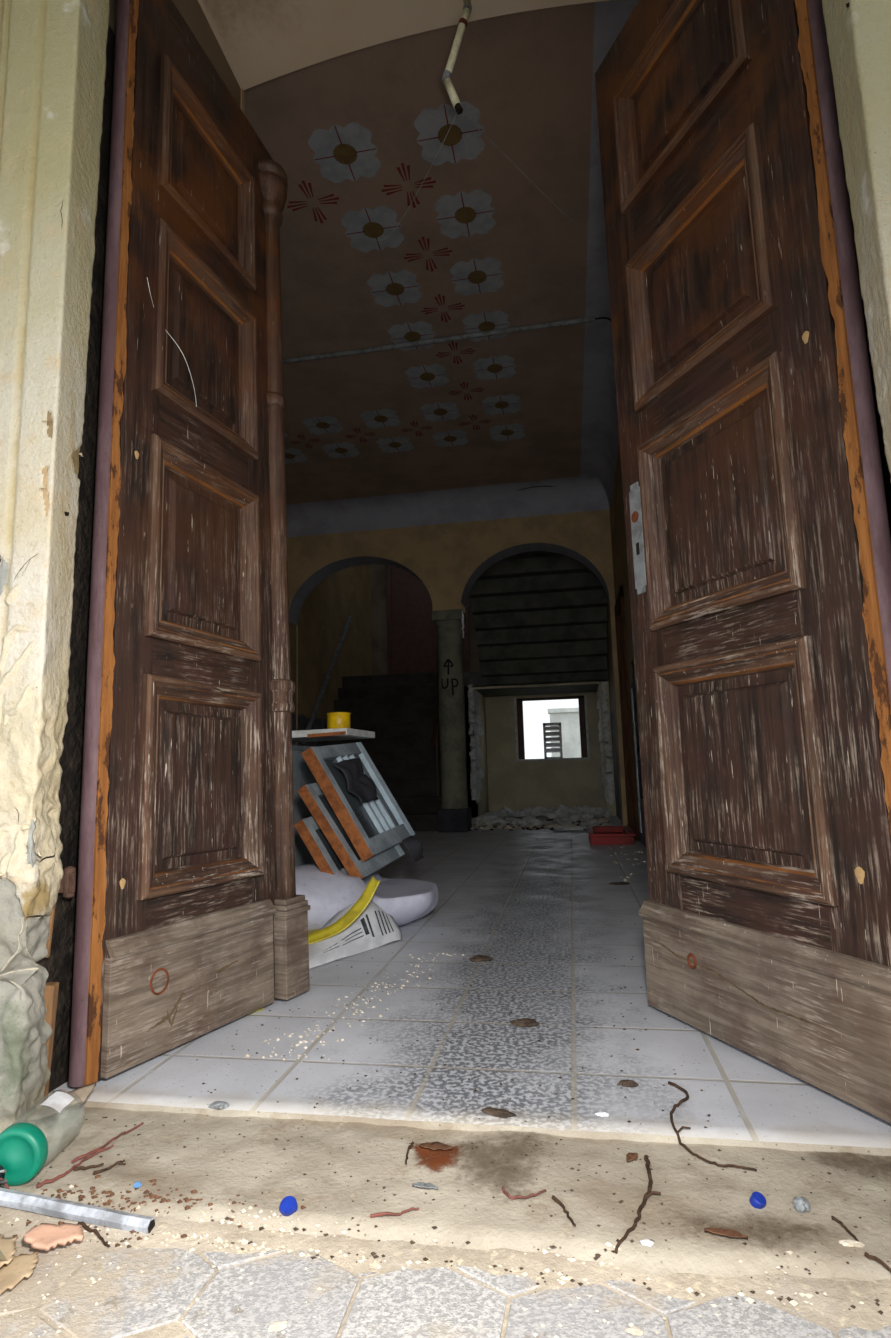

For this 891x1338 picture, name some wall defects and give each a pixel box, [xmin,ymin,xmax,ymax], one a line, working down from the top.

flaking render [22,819,44,868]
flaking render [0,873,53,1133]